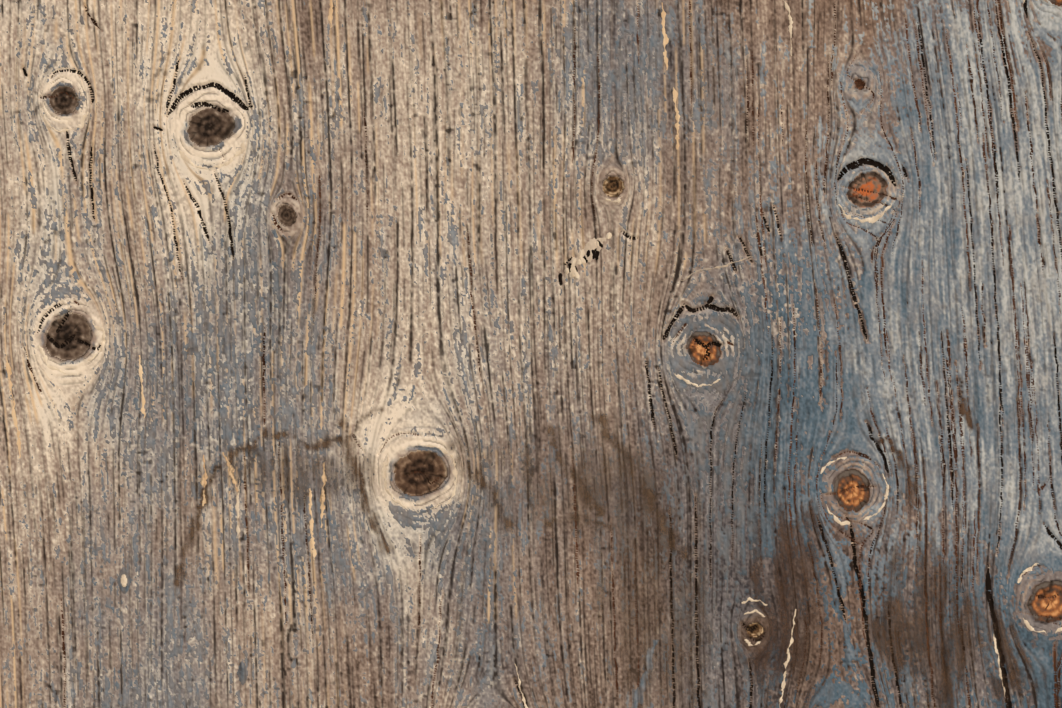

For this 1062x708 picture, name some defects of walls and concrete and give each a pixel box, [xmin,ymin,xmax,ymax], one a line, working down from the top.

peeling [117,0,229,114]
peeling [221,0,250,75]
peeling [354,1,431,115]
peeling [436,0,482,90]
peeling [800,0,817,76]
peeling [348,170,409,363]
peeling [387,302,438,410]
peeling [407,446,452,466]